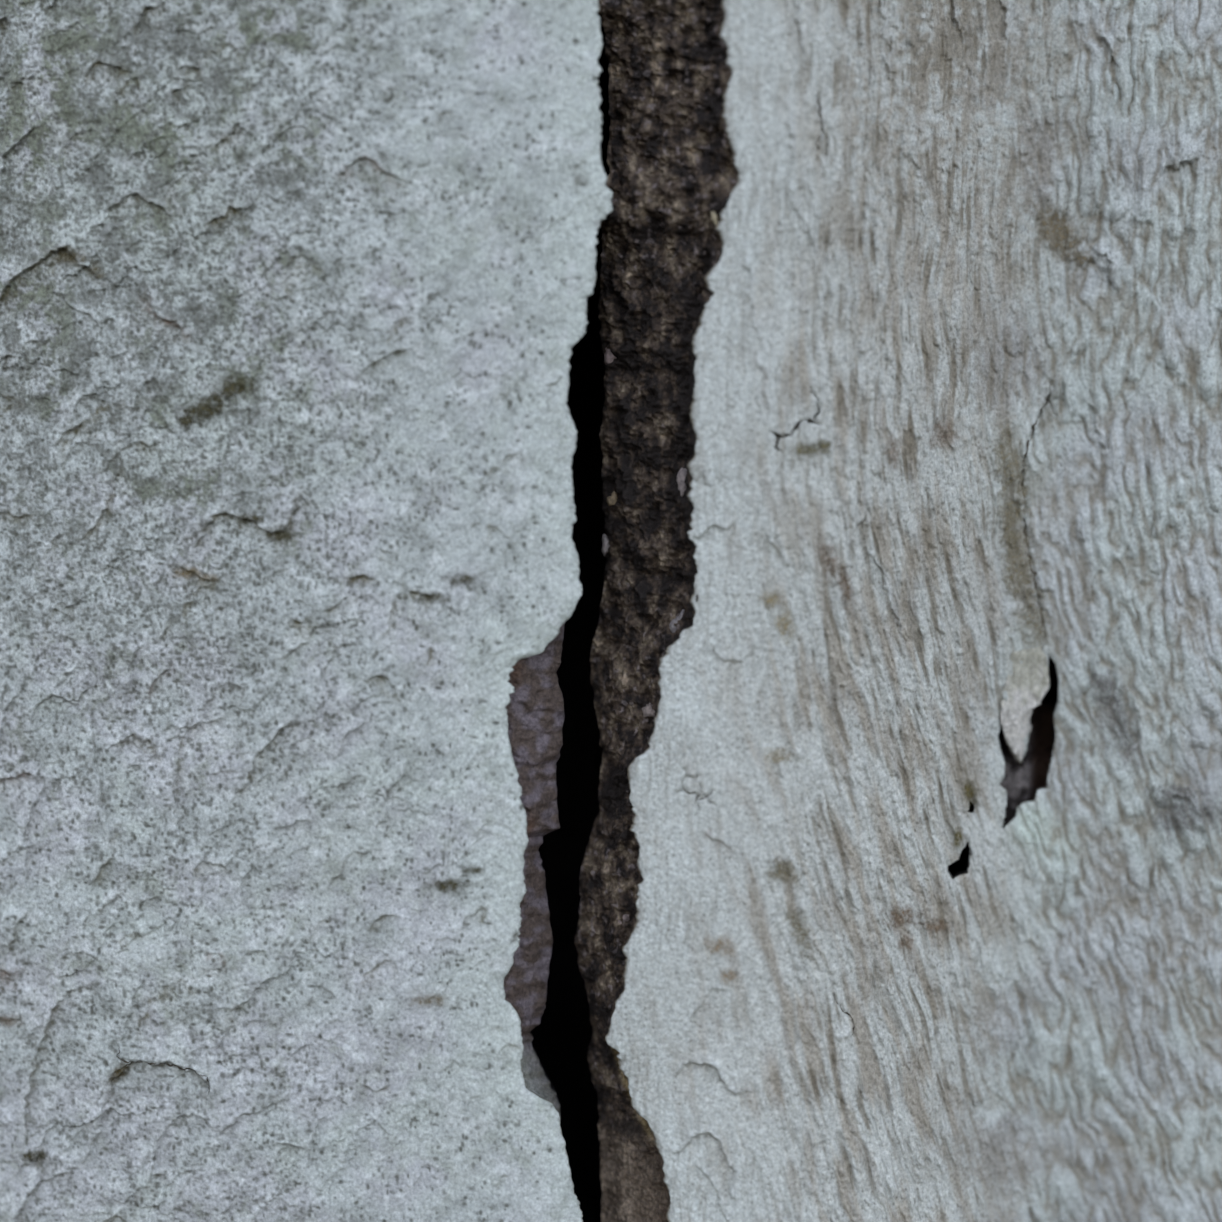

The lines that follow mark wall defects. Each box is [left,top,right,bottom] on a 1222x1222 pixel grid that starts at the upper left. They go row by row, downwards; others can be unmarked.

crack [504,0,739,1222]
peeling [1000,646,1049,760]